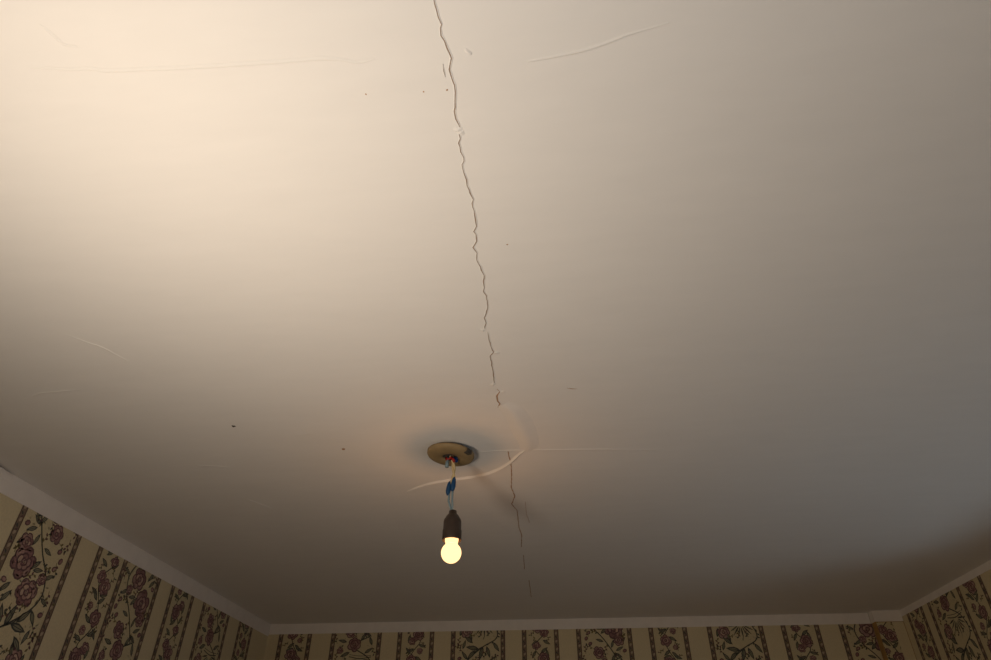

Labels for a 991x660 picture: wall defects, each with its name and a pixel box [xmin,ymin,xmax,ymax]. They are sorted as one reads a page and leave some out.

crack [433,0,505,408]
crack [507,451,532,597]